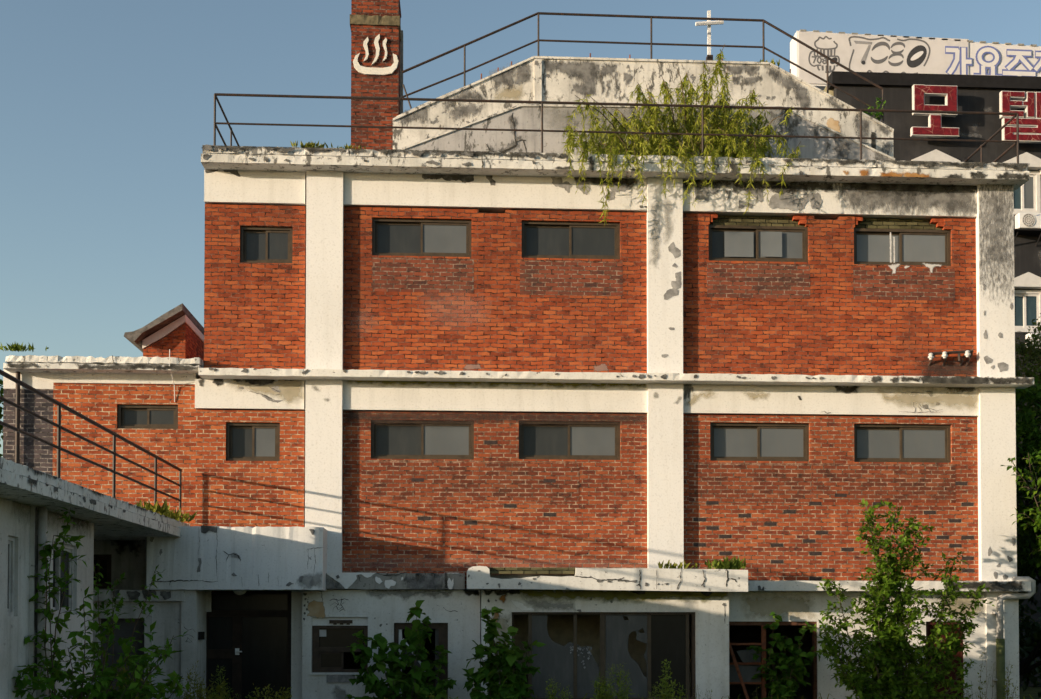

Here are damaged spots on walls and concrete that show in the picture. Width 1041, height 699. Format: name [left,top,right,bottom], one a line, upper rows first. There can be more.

damp [400,107,428,126]
damp [442,90,484,120]
damp [492,65,530,98]
damp [545,59,776,133]
damp [725,64,810,113]
peeling [202,145,294,177]
peeling [412,151,496,185]
damp [683,119,1030,293]
peeling [664,242,681,300]
peeling [988,538,1015,580]
peeling [327,572,403,589]
crack [575,569,737,621]